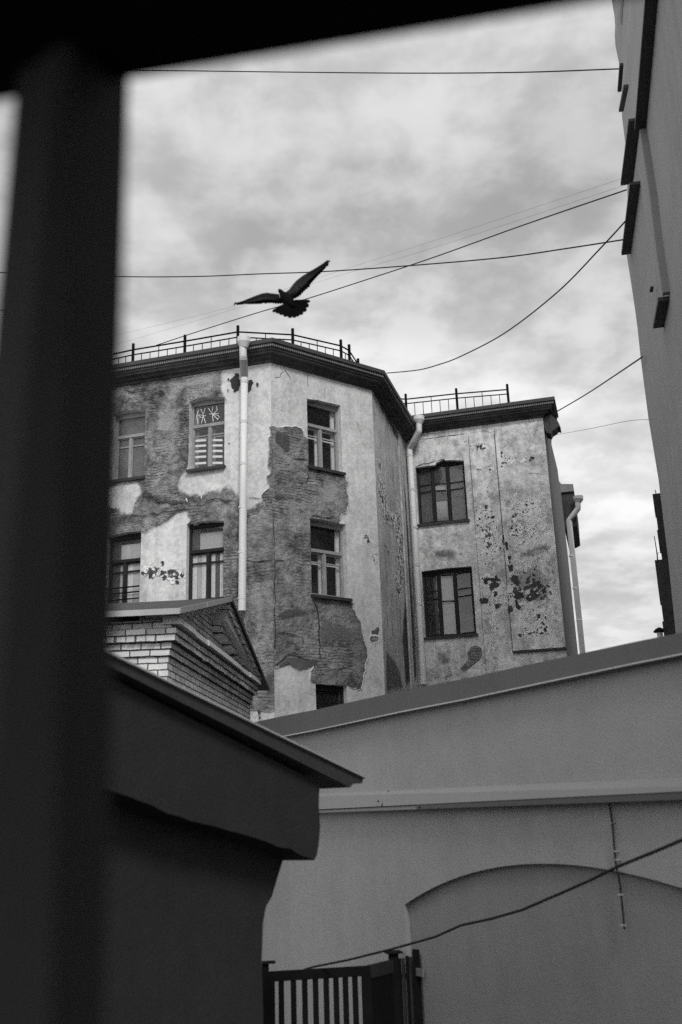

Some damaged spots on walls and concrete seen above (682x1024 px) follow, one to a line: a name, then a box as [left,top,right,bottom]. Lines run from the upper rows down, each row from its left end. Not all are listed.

flaking render [117,370,380,719]
peeling [476,452,534,471]
peeling [461,486,560,671]